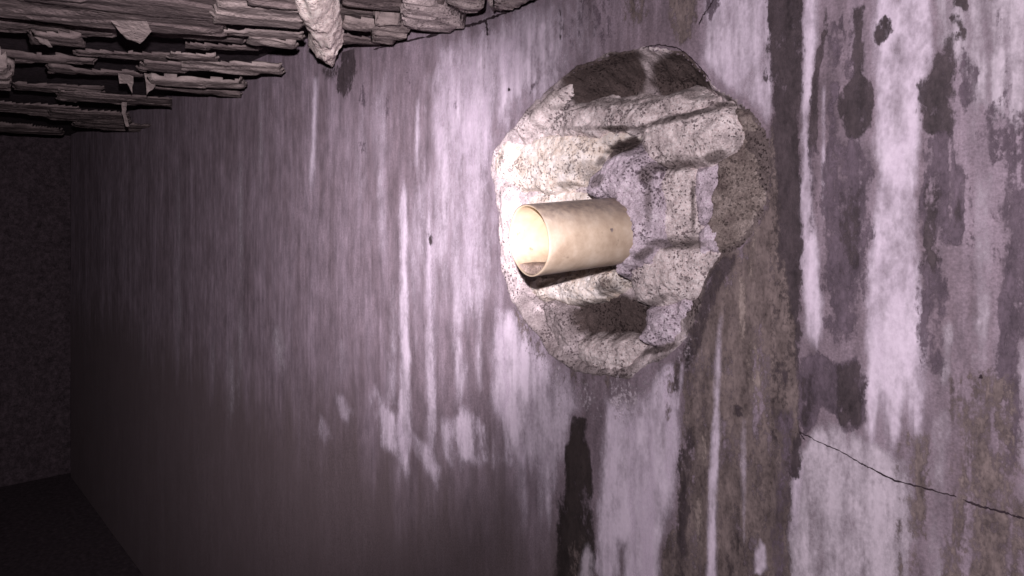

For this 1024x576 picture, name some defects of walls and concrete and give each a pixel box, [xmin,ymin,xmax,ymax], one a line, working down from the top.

peeling [112,21,152,44]
peeling [118,73,155,127]
water stain [494,0,1024,576]
crack [799,431,1024,519]